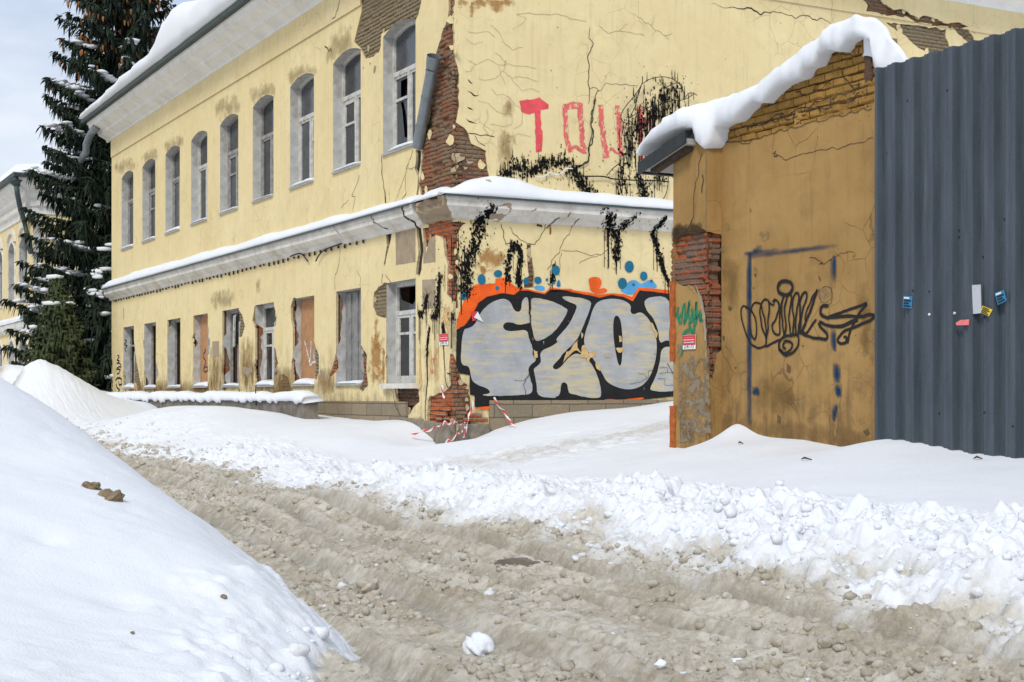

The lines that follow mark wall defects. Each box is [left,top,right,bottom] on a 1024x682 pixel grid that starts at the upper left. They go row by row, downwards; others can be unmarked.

spalling [355,0,421,73]
crack [712,3,829,22]
flaking render [419,0,488,199]
crack [466,13,672,168]
crack [726,49,872,160]
flaking render [727,40,875,143]
crack [501,209,608,270]
water stain [371,321,384,379]
spalling [374,283,388,318]
spalling [396,348,488,431]
flaking render [670,223,732,443]